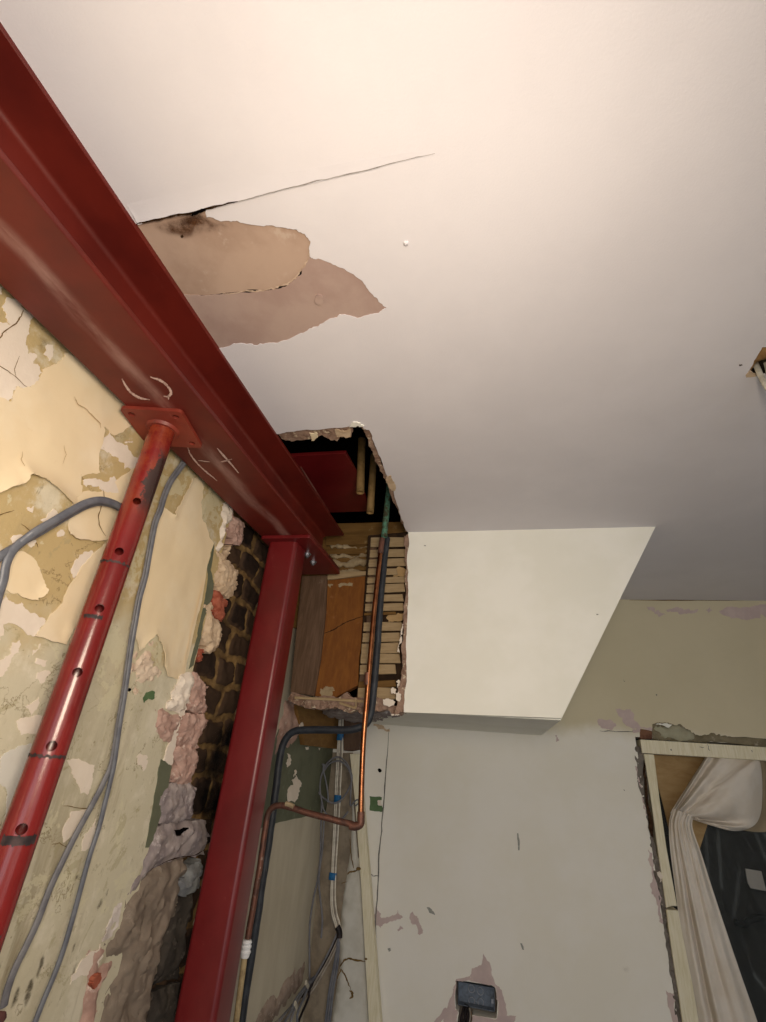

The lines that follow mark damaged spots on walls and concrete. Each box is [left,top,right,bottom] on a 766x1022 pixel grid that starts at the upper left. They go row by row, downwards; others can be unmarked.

crack [127,152,435,225]
peeling [137,211,386,348]
peeling [0,286,138,684]
peeling [0,697,43,819]
peeling [67,477,245,1022]
peeling [62,809,96,851]
peeling [434,954,516,1022]